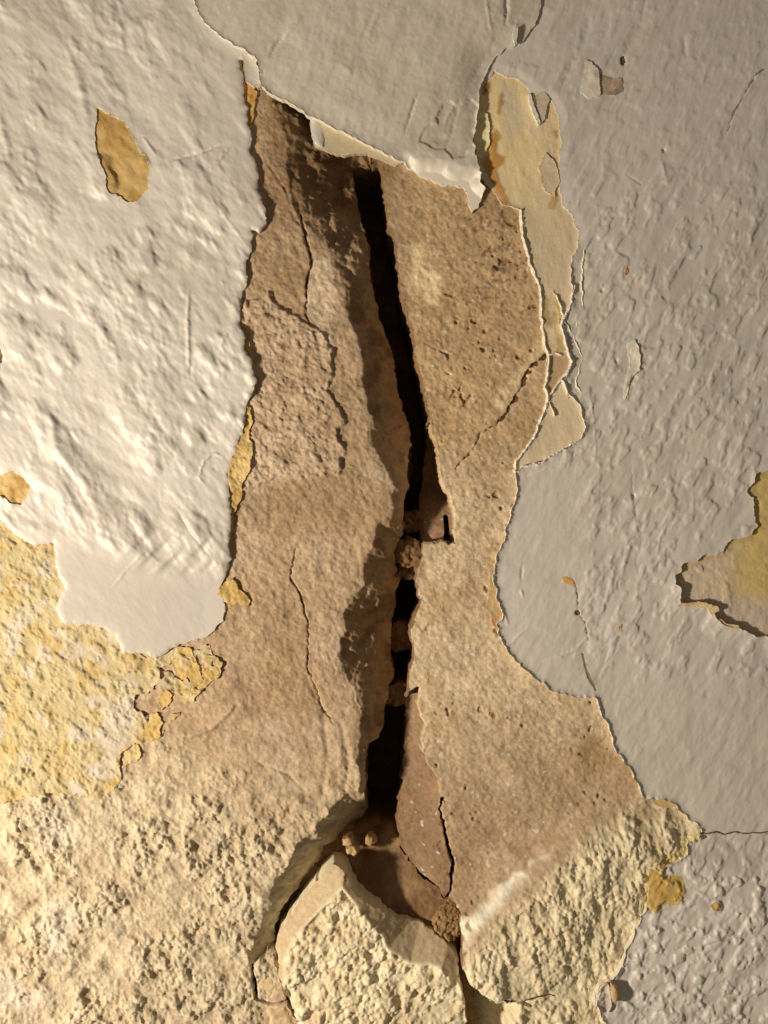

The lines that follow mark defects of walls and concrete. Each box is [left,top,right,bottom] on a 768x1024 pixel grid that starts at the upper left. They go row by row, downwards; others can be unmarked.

peeling [95,109,149,202]
flaking render [194,0,541,214]
peeling [473,71,585,474]
crack [358,201,423,539]
peeling [0,472,31,505]
peeling [0,520,223,804]
crack [392,649,405,679]
crack [393,578,415,618]
crack [443,515,452,544]
peeling [675,471,768,637]
crack [276,704,556,1024]
crack [252,963,289,1003]